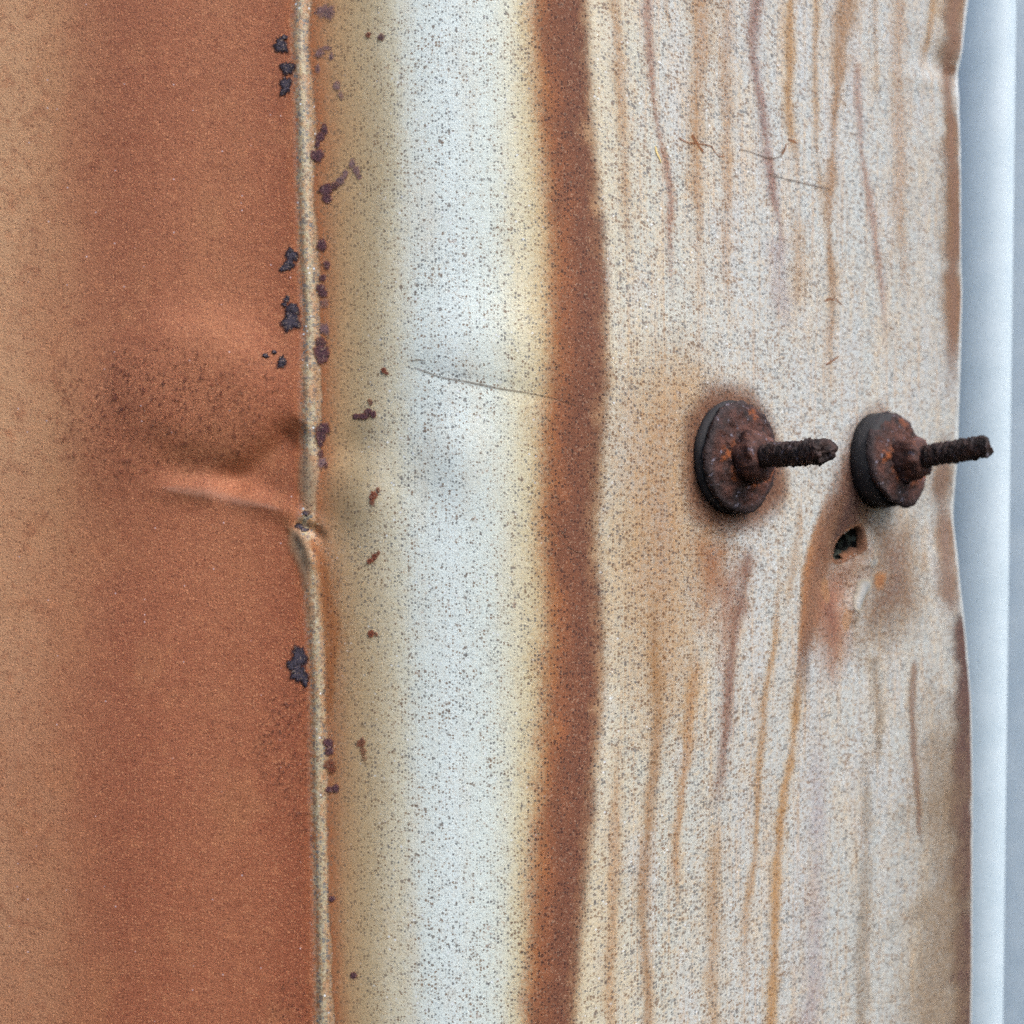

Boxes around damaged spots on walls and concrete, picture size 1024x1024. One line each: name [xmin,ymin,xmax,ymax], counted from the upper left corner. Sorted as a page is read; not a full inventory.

corrosion [272,34,296,96]
corrosion [279,247,299,272]
corrosion [280,295,302,333]
corrosion [927,0,964,356]
corrosion [286,644,310,688]
peeling [289,528,310,586]
corrosion [521,0,611,1024]
corrosion [624,375,786,748]
corrosion [799,445,917,668]
corrosion [937,516,956,604]
corrosion [767,754,794,1024]
corrosion [946,617,972,1024]